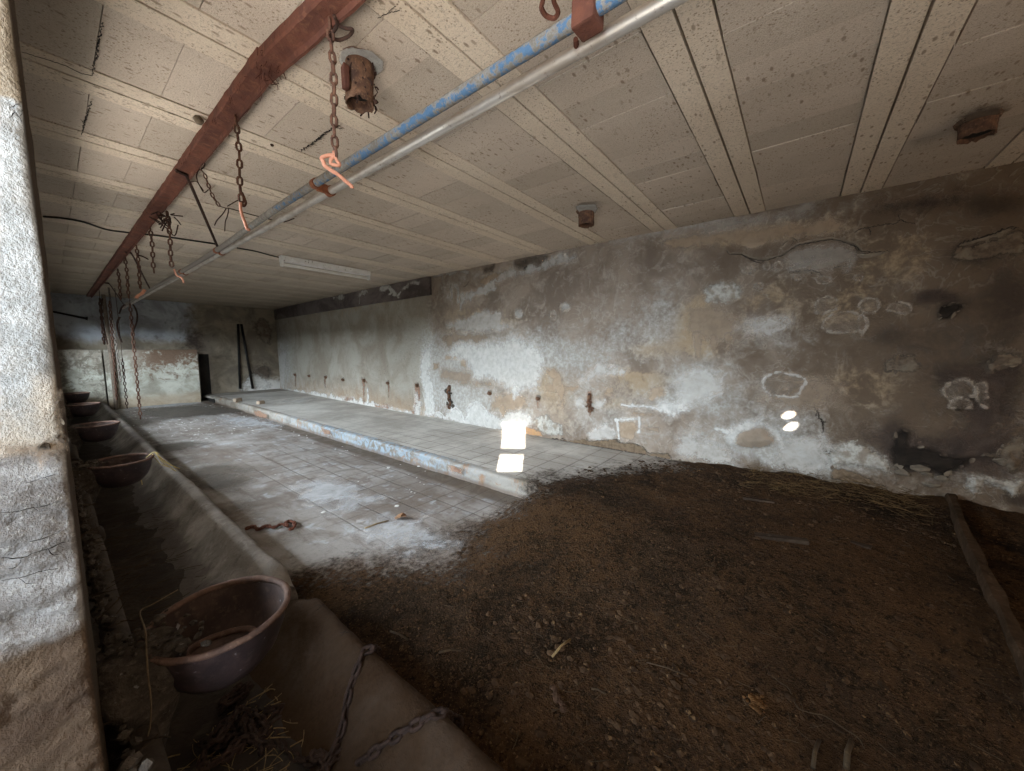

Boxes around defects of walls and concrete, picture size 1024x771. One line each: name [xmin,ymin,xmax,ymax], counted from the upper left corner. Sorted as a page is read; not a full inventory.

crack [22,22,104,76]
damp [514,255,548,272]
crack [726,215,915,277]
damp [689,282,740,358]
damp [294,324,578,435]
damp [614,387,689,439]
damp [715,419,780,441]
damp [769,376,835,408]
damp [830,367,1024,495]
spalling [891,429,1024,477]